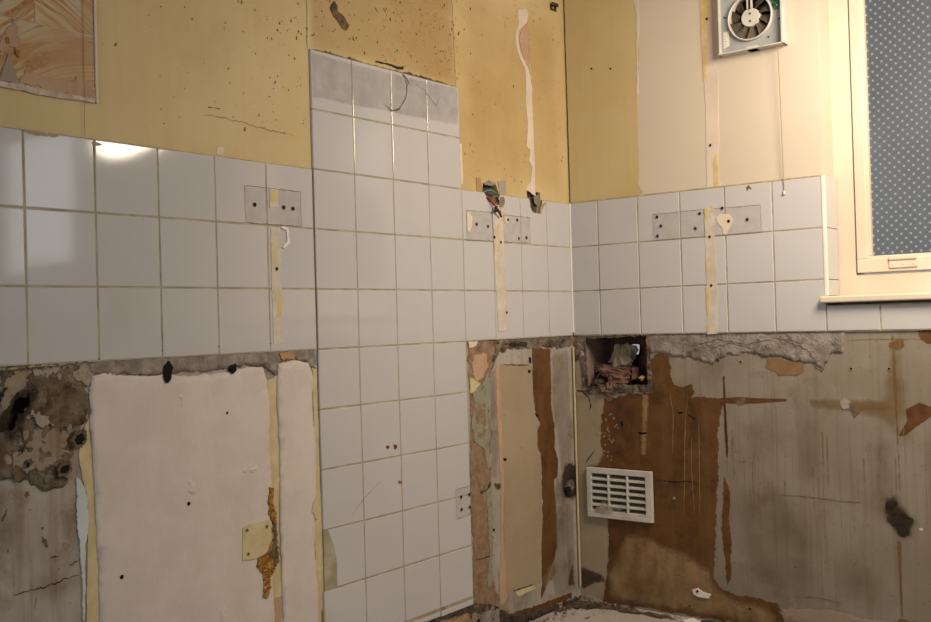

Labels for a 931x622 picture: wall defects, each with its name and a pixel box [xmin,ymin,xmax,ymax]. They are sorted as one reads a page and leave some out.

damp [0,388,39,441]
spalling [0,364,94,622]
flaking render [430,335,916,622]